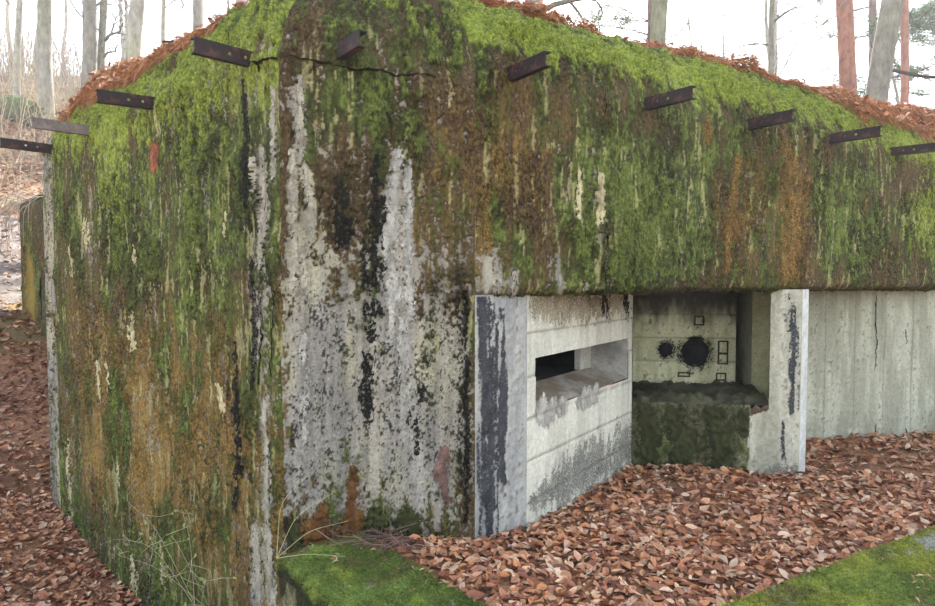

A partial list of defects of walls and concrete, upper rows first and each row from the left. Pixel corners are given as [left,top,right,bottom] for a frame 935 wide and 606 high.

crack [248,55,436,78]
corrosion [149,141,160,177]
water stain [297,333,312,469]
water stain [327,145,426,456]
water stain [462,290,509,540]
water stain [764,294,800,476]